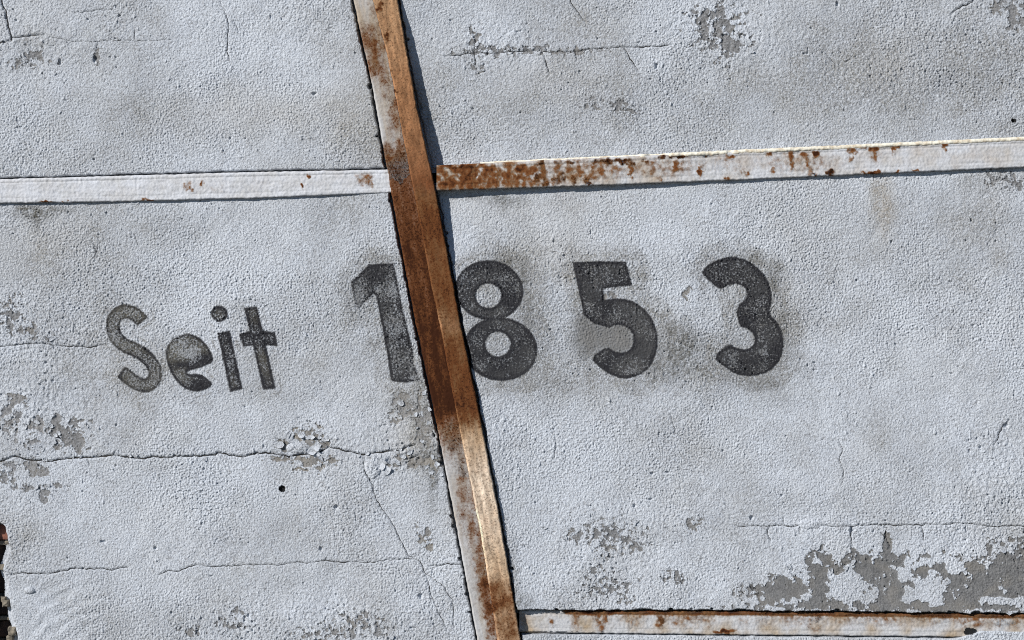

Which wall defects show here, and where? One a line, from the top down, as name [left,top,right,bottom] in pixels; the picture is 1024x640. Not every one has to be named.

crack [450,30,665,68]
peeling [680,0,762,68]
corrosion [788,151,835,176]
corrosion [847,146,900,174]
corrosion [360,1,684,640]
peeling [0,393,93,504]
peeling [262,422,340,475]
crack [0,440,460,629]
peeling [677,517,706,534]
peeling [722,528,1024,615]
corrosion [563,610,1024,634]